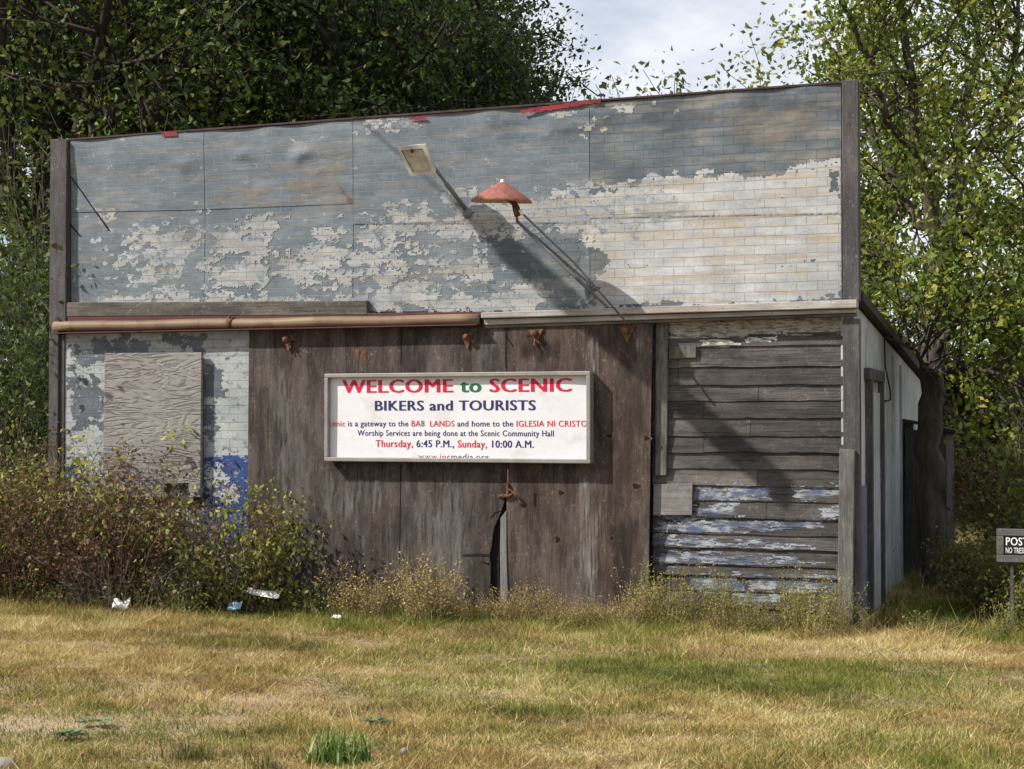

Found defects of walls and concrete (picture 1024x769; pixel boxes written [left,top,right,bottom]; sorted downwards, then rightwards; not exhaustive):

peeling [72,158,842,313]
peeling [66,332,229,441]
peeling [204,462,240,505]
crack [462,500,508,603]
peeling [649,481,839,607]